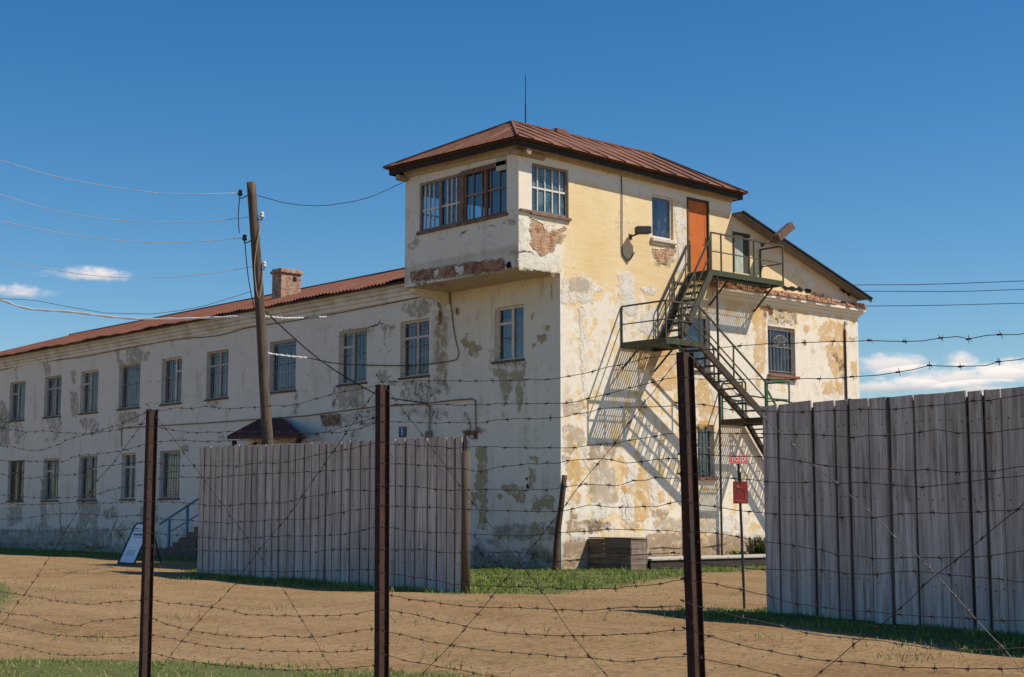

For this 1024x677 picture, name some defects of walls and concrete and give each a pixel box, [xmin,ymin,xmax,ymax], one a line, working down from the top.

peeling [652,203,688,273]
damp [493,367,525,411]
flaking render [410,217,683,567]
peeling [752,309,858,394]